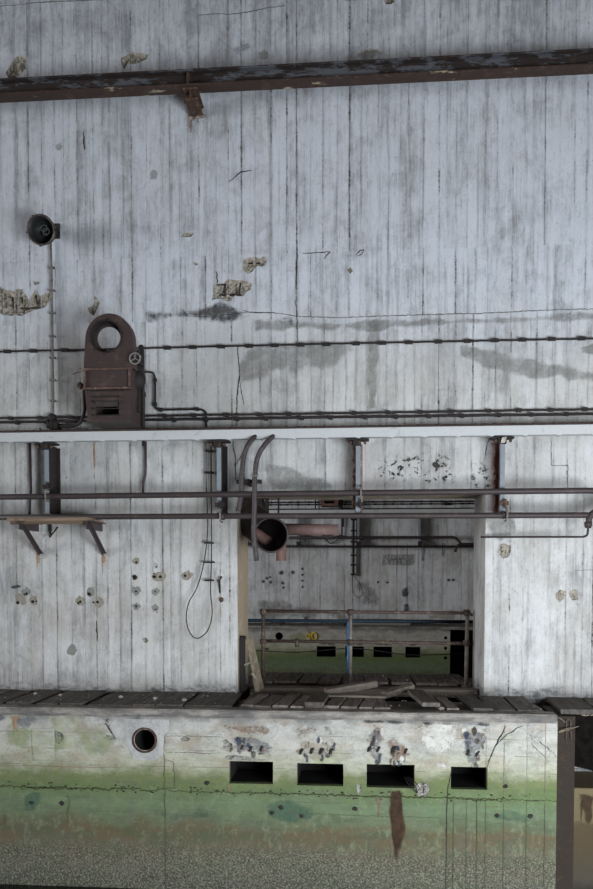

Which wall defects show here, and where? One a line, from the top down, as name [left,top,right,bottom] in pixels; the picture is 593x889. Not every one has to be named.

spalling [6,56,27,78]
spalling [121,51,147,68]
spalling [0,281,51,316]
spalling [212,256,266,301]
peeling [223,723,272,761]
peeling [296,727,336,763]
peeling [366,725,410,766]
crack [487,723,556,767]
crack [163,733,222,886]
crack [286,769,504,889]
rust [390,791,405,858]
crack [525,786,545,889]